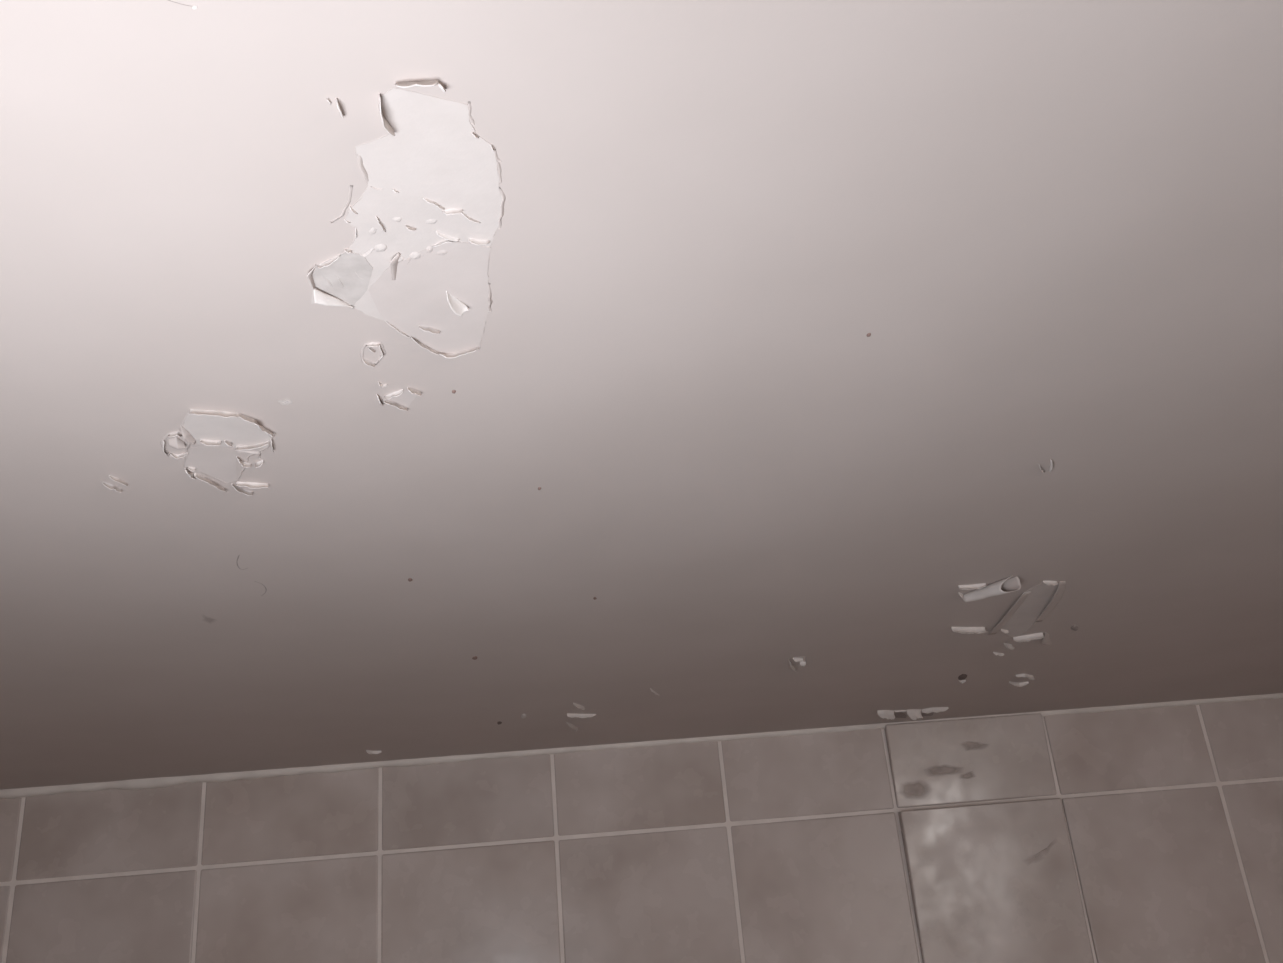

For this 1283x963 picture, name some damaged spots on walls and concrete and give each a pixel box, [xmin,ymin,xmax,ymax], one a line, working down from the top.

peeling [306,80,506,358]
peeling [376,381,422,411]
peeling [160,409,275,496]
peeling [951,576,1066,656]
peeling [1009,674,1034,687]